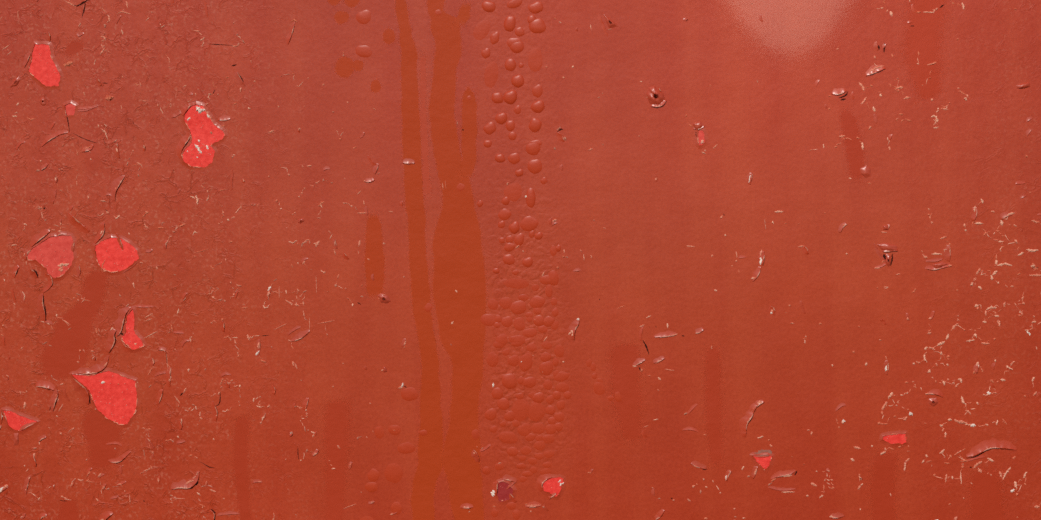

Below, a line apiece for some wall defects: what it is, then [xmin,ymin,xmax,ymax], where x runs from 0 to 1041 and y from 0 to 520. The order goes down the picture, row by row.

spalling [22,41,73,90]
spalling [41,78,113,147]
spalling [171,92,231,171]
spalling [12,213,167,282]
peeling [971,239,1038,290]
spalling [69,355,140,428]
spalling [0,402,46,459]
spalling [491,473,567,507]
spalling [739,400,796,493]
spalling [879,412,913,455]
peeling [966,438,1027,492]